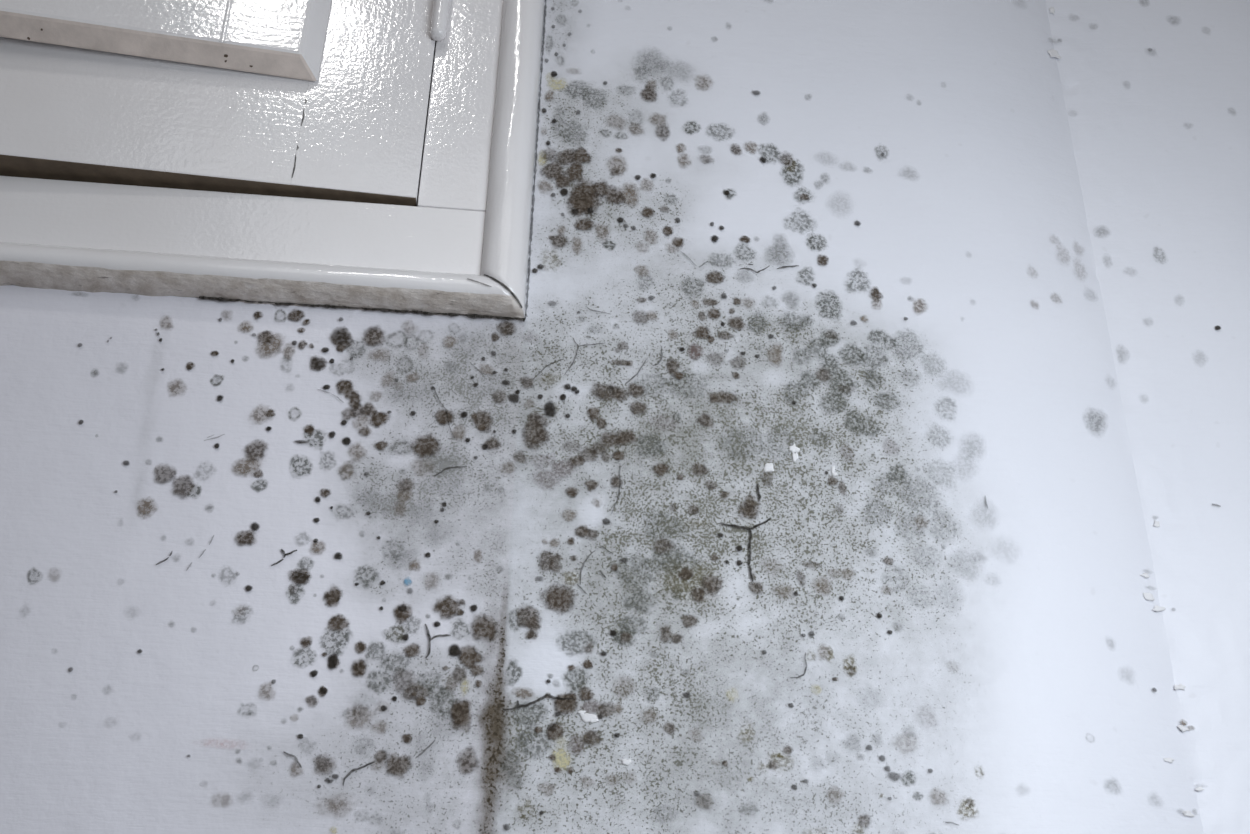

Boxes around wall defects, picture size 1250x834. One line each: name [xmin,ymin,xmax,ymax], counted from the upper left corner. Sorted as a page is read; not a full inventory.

water stain [234,4,971,834]
water stain [156,466,201,497]
water stain [138,500,155,515]